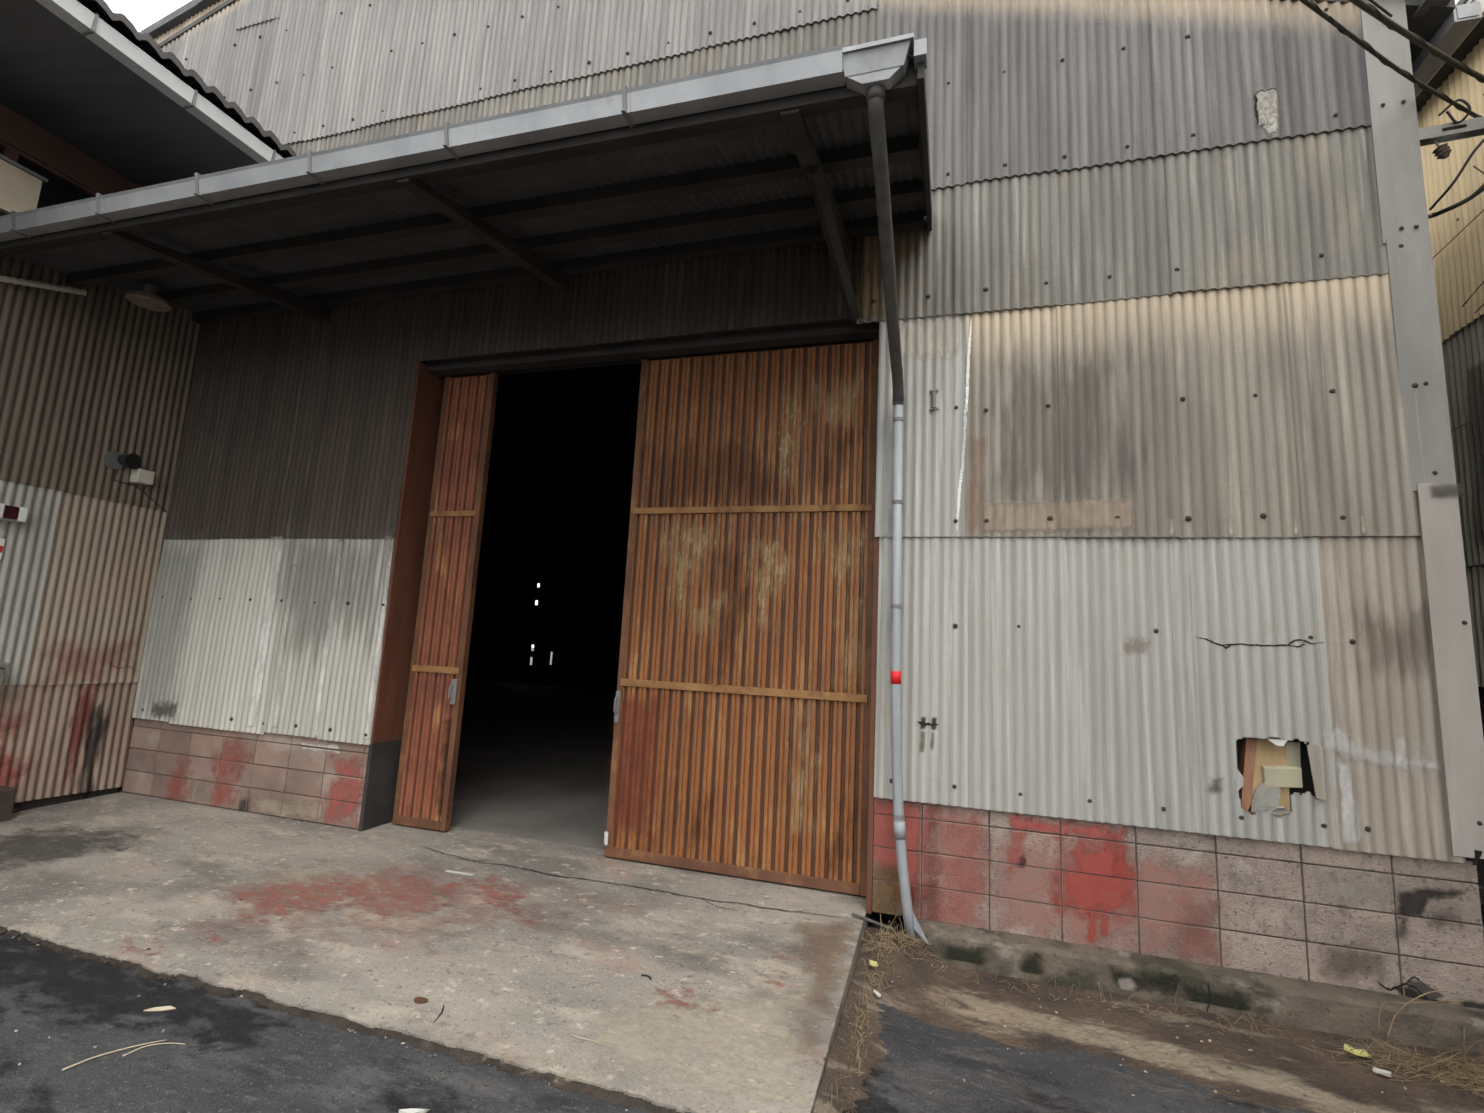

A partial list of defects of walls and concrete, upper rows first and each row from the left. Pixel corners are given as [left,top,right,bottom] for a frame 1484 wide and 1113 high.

rust [437,720,452,814]
peeling [1236,729,1434,843]